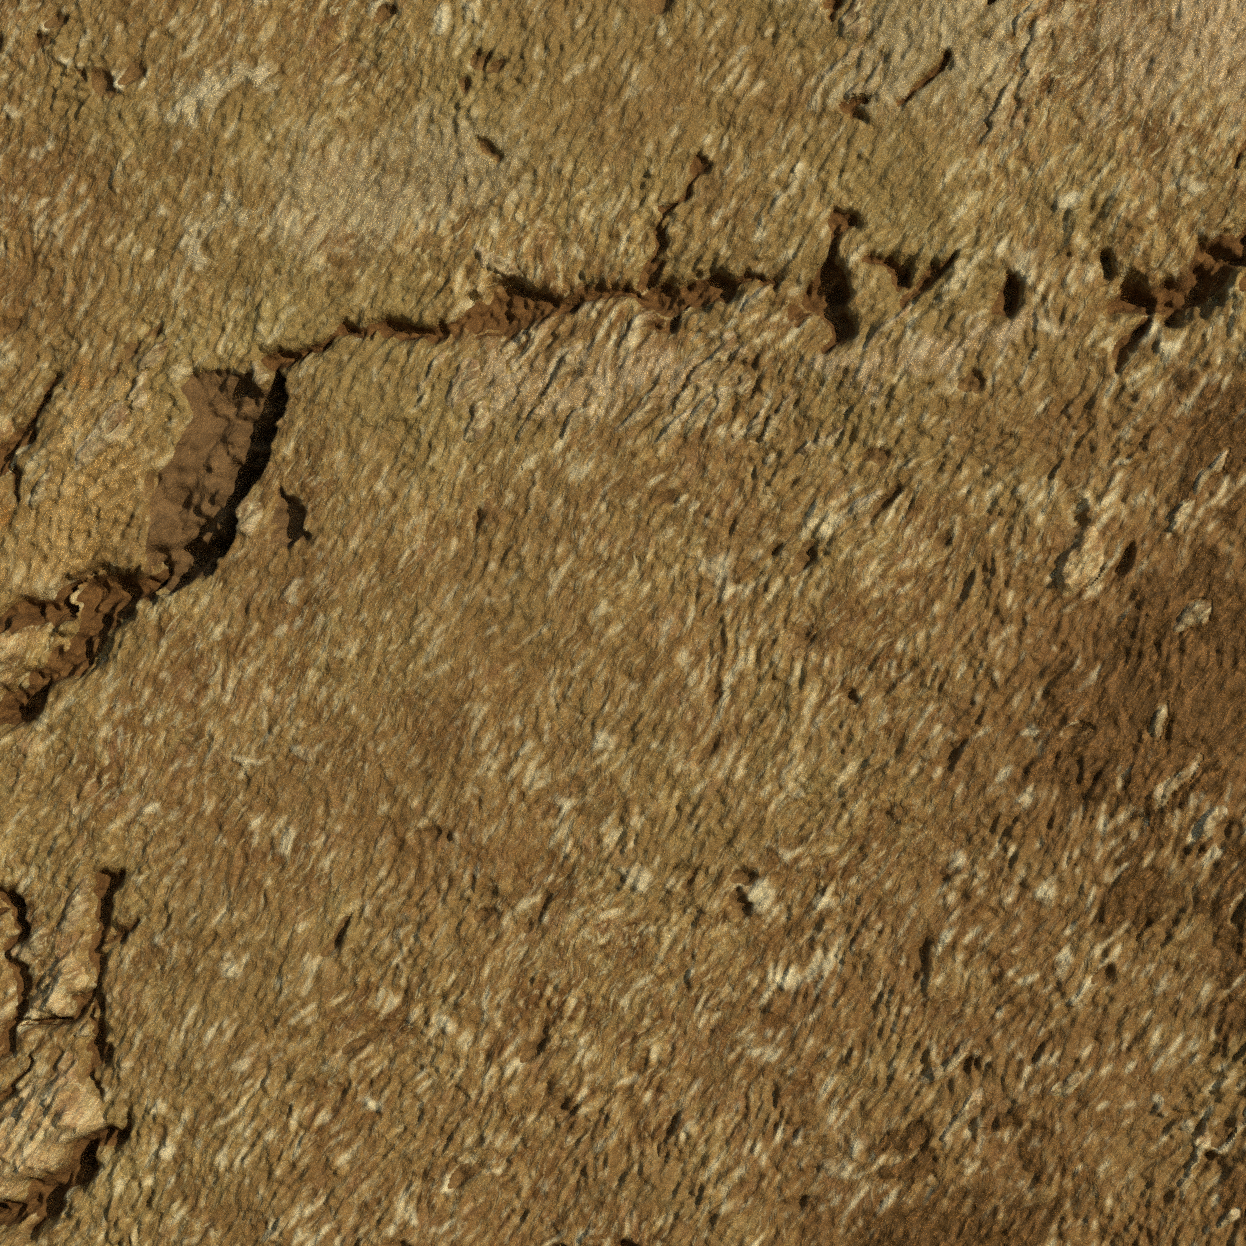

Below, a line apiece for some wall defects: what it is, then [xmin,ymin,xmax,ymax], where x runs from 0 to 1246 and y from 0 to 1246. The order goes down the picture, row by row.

crack [1236,140,1246,167]
crack [261,153,954,372]
crack [991,274,1019,316]
crack [1107,228,1246,373]
peeling [251,361,273,387]
crack [0,375,61,501]
spalling [235,487,311,548]
crack [0,569,173,725]
crack [0,870,140,1103]
crack [0,1116,132,1232]